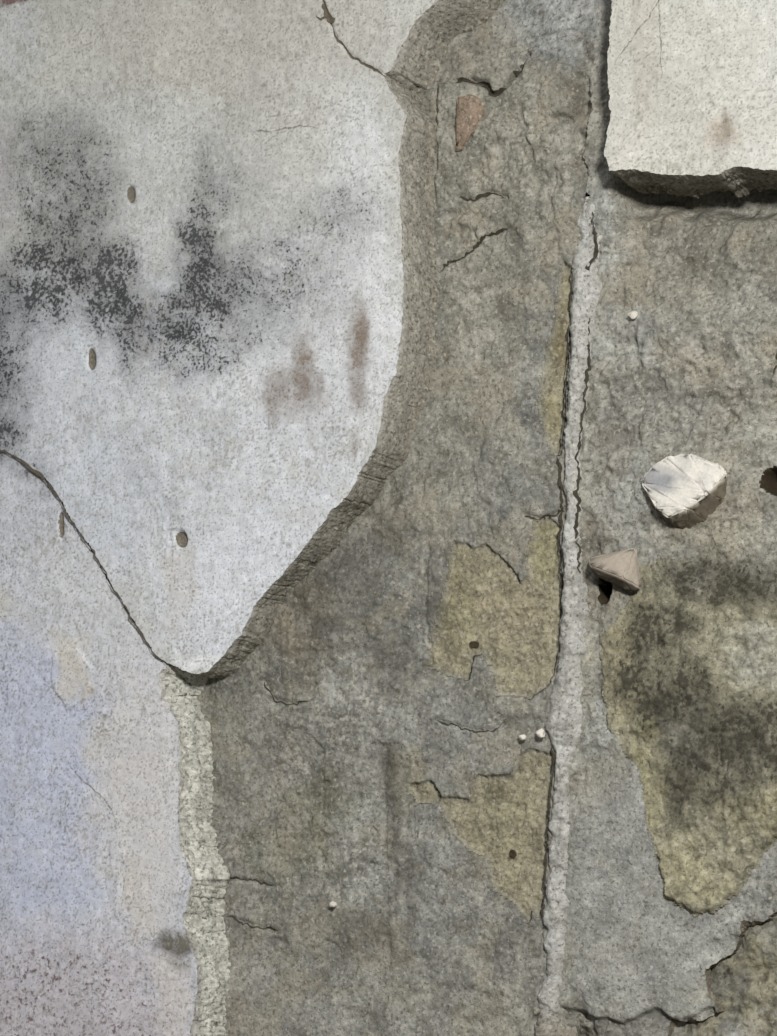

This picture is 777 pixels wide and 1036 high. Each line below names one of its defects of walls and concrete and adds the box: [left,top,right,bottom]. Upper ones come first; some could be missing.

crack [316,0,388,77]
water stain [0,113,375,412]
water stain [0,418,27,456]
crack [0,450,166,663]
spalling [77,0,612,1036]
spalling [557,80,777,1036]